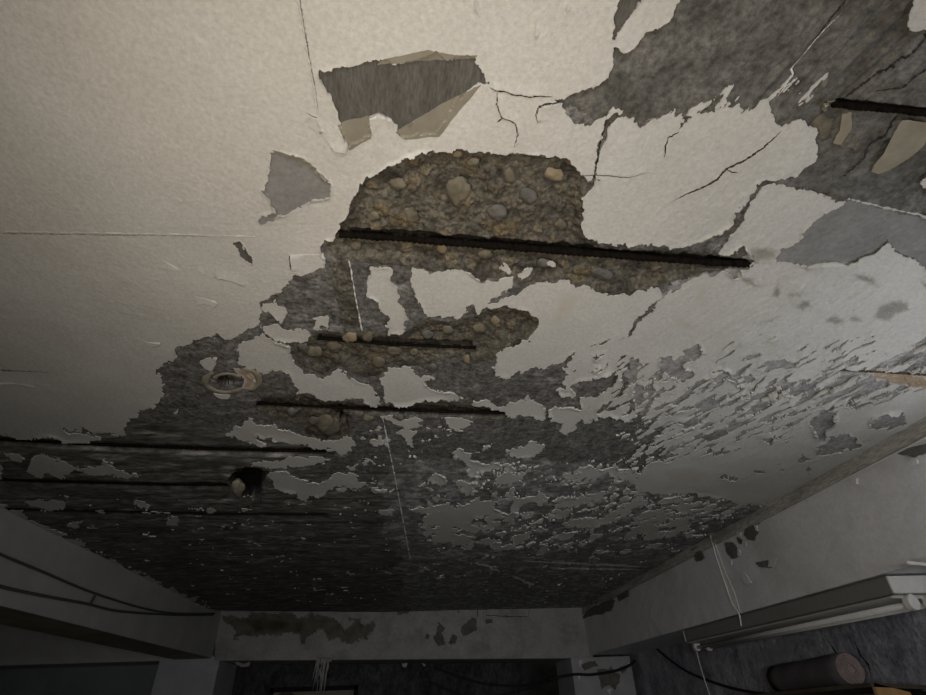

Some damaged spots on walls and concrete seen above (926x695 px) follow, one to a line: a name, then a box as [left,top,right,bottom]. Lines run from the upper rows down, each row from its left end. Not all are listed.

peeling [318,50,489,160]
crack [491,88,560,147]
crack [562,120,641,186]
crack [674,131,781,201]
peeling [410,0,926,540]
peeling [0,149,759,619]
peeling [425,618,493,646]